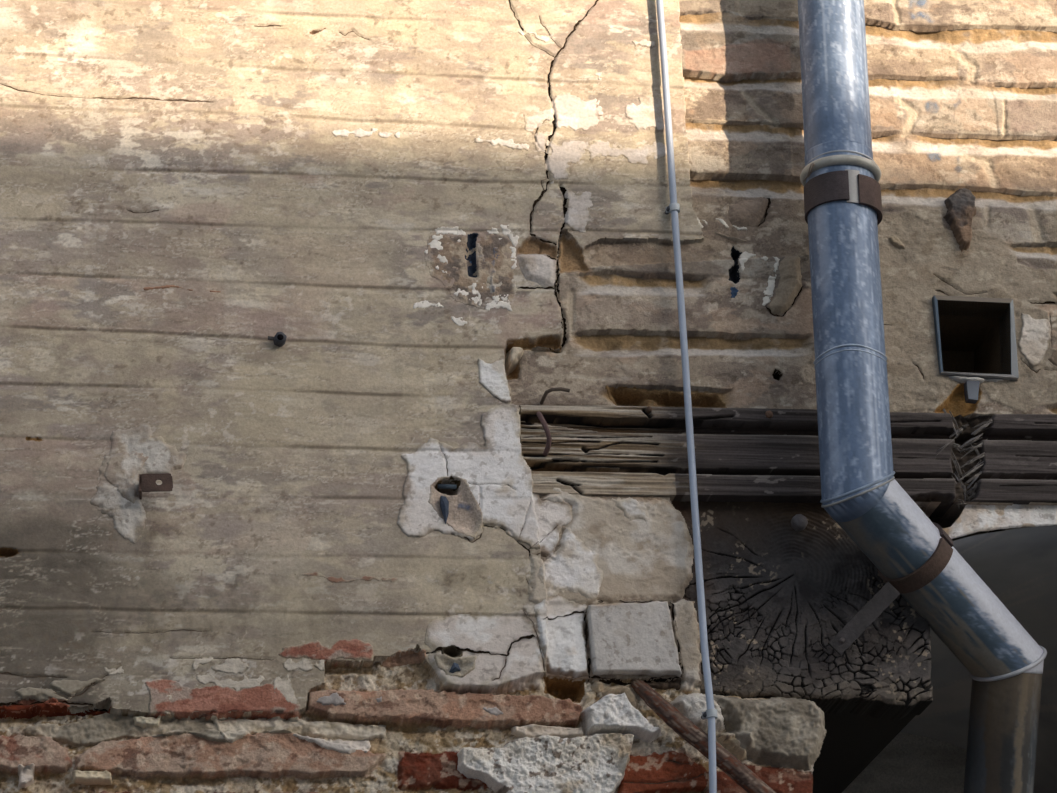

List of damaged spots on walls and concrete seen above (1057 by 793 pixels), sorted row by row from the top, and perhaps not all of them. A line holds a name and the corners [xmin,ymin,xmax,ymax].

peeling [332,128,400,138]
peeling [423,92,667,309]
crack [509,0,599,353]
peeling [0,639,426,754]